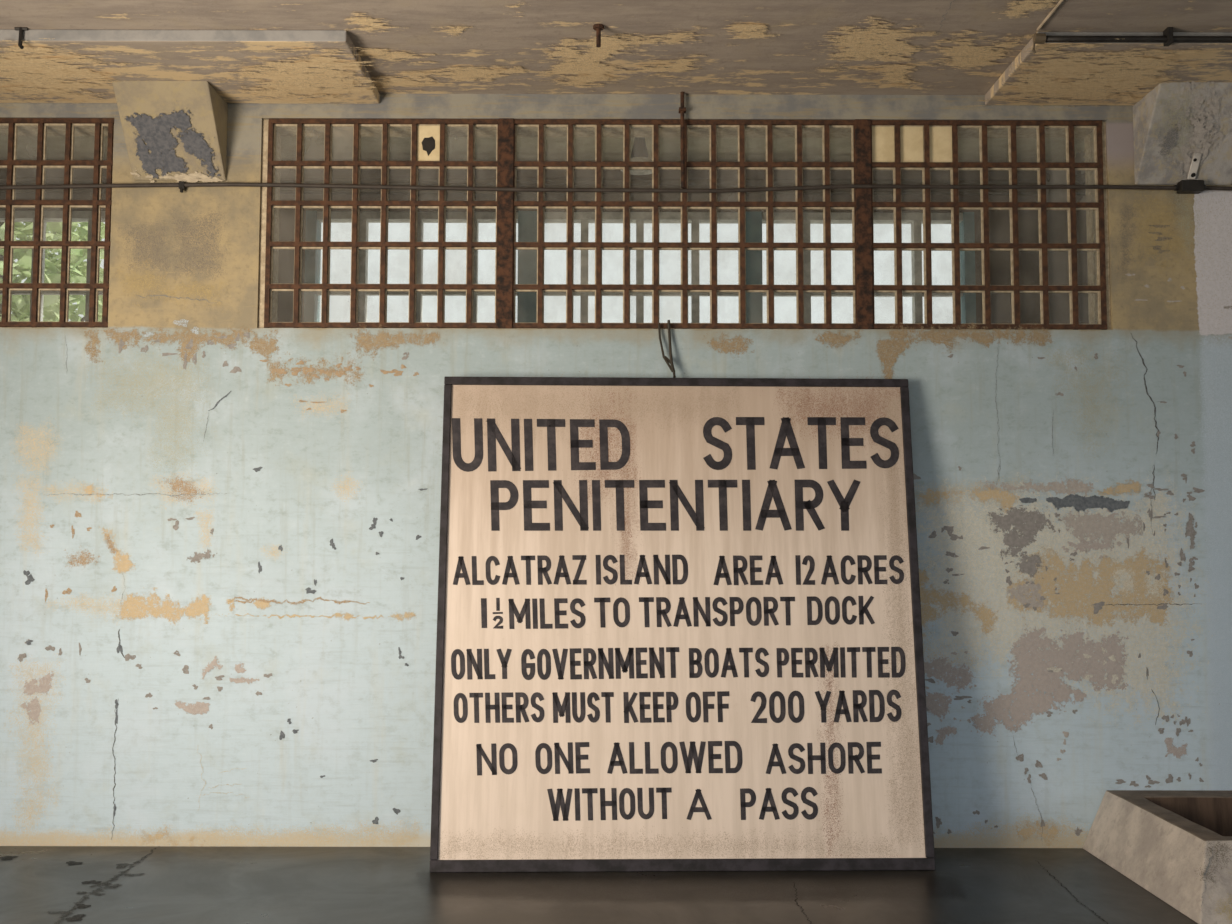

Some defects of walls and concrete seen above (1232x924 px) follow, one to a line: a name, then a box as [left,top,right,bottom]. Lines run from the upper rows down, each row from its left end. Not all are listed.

spalling [812,17,1220,107]
spalling [122,110,223,183]
peeling [103,319,419,421]
crack [1131,334,1163,535]
peeling [42,465,227,564]
crack [116,629,125,658]
peeling [174,650,273,729]
peeling [45,579,415,627]
spalling [919,526,1149,783]
peeling [1116,714,1204,788]
crack [48,698,160,924]